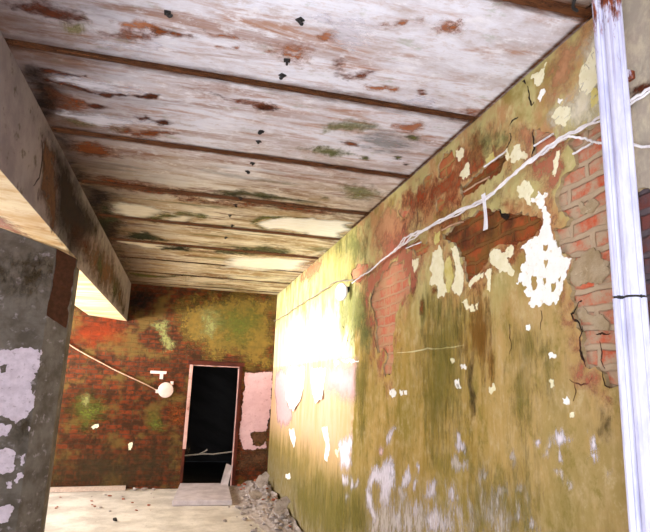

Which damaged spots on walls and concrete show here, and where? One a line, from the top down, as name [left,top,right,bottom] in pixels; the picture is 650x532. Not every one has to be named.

leakage [25,68,158,116]
leakage [54,151,189,315]
leakage [215,246,293,256]
spalling [370,123,619,388]
peeling [0,347,43,436]
peeling [174,292,356,469]
leakage [340,284,372,350]
crack [569,300,610,401]
peeling [0,504,14,524]
peeling [0,448,25,489]
leakage [338,435,358,489]
leakage [366,428,534,532]